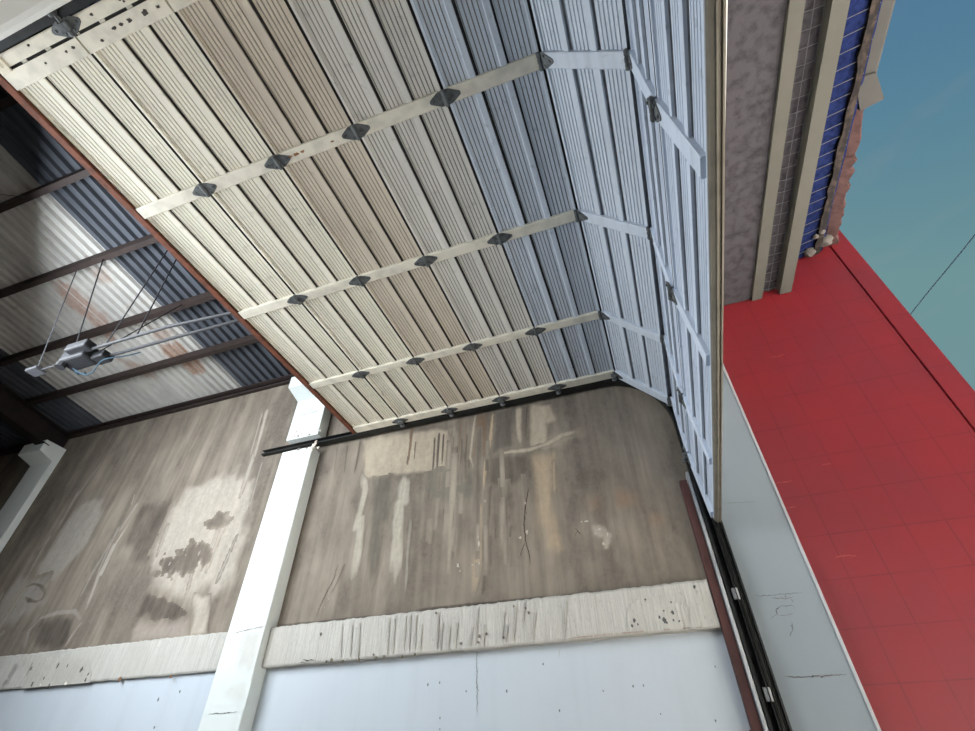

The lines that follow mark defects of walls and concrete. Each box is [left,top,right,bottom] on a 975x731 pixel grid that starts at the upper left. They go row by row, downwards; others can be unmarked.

water stain [0,408,269,688]
water stain [214,403,657,709]
crack [785,672,846,680]